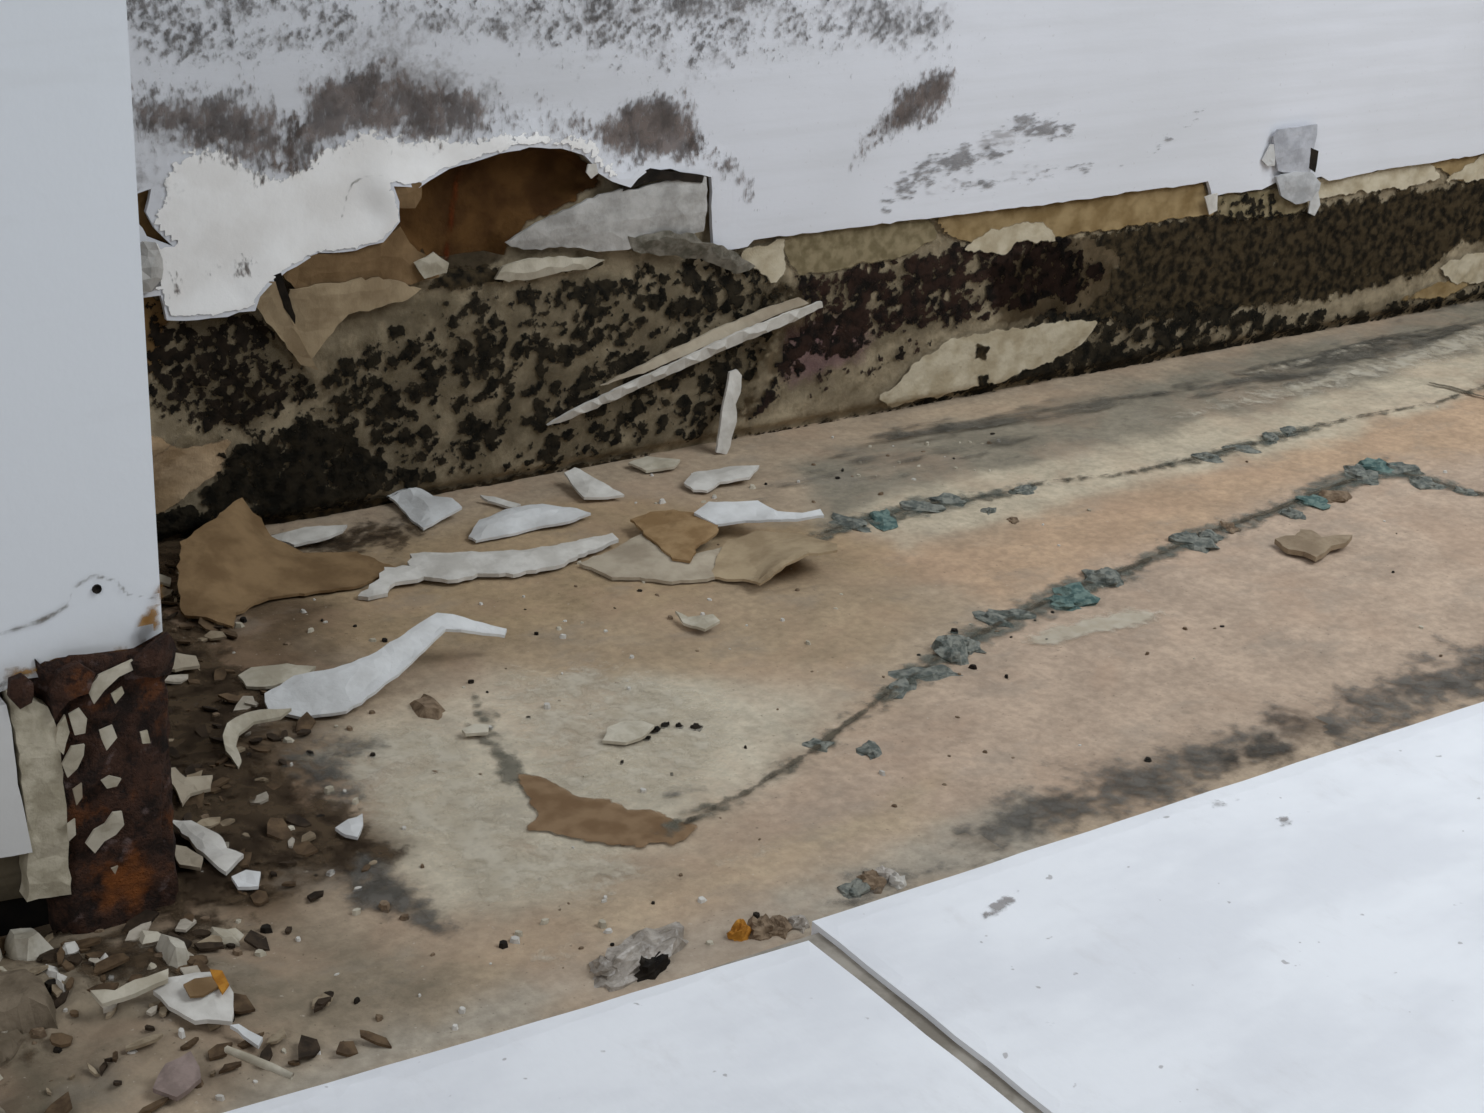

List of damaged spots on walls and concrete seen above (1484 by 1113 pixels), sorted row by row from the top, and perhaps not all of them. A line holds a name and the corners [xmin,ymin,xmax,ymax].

damp [131,56,518,183]
damp [537,90,754,199]
damp [861,68,955,154]
peeling [1262,124,1484,216]
peeling [140,129,618,374]
peeling [546,297,823,425]
peeling [468,467,624,543]
peeling [684,465,824,526]
crack [816,382,1484,540]
rust [138,588,160,630]
damp [44,179,1484,986]
crack [684,457,1484,824]